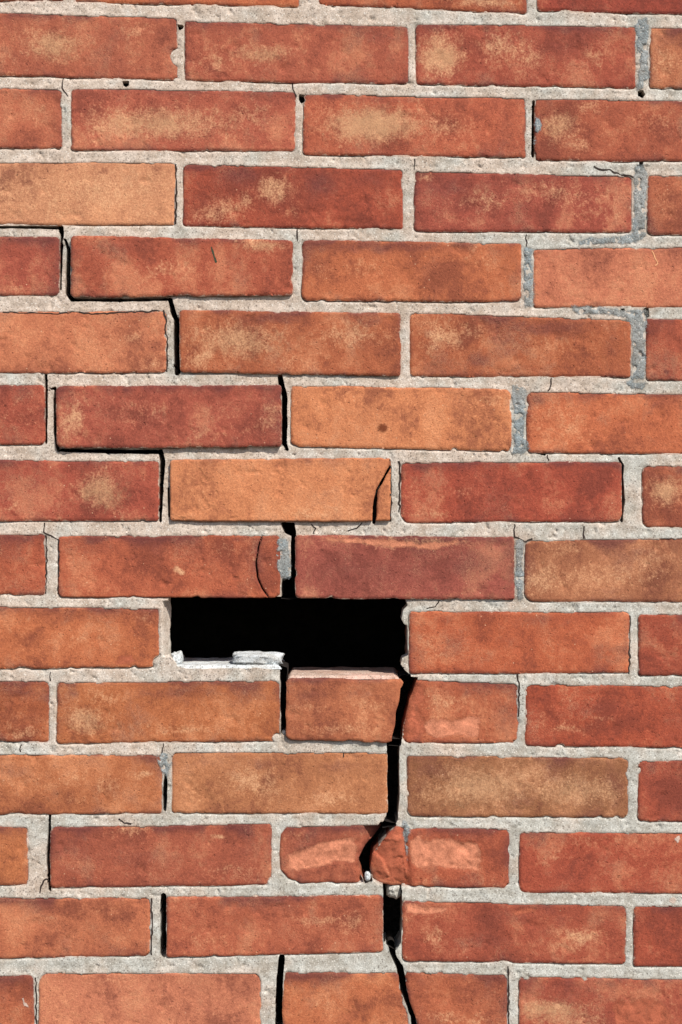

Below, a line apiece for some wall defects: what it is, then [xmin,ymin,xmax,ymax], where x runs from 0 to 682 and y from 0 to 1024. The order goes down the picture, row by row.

crack [33,226,69,245]
crack [2,273,181,374]
crack [279,378,289,451]
crack [57,449,165,521]
crack [348,459,401,531]
crack [43,523,60,594]
crack [256,522,316,599]
spalling [171,650,184,664]
crack [279,660,289,728]
crack [359,671,416,1024]
crack [150,893,167,955]
crack [275,954,285,1022]